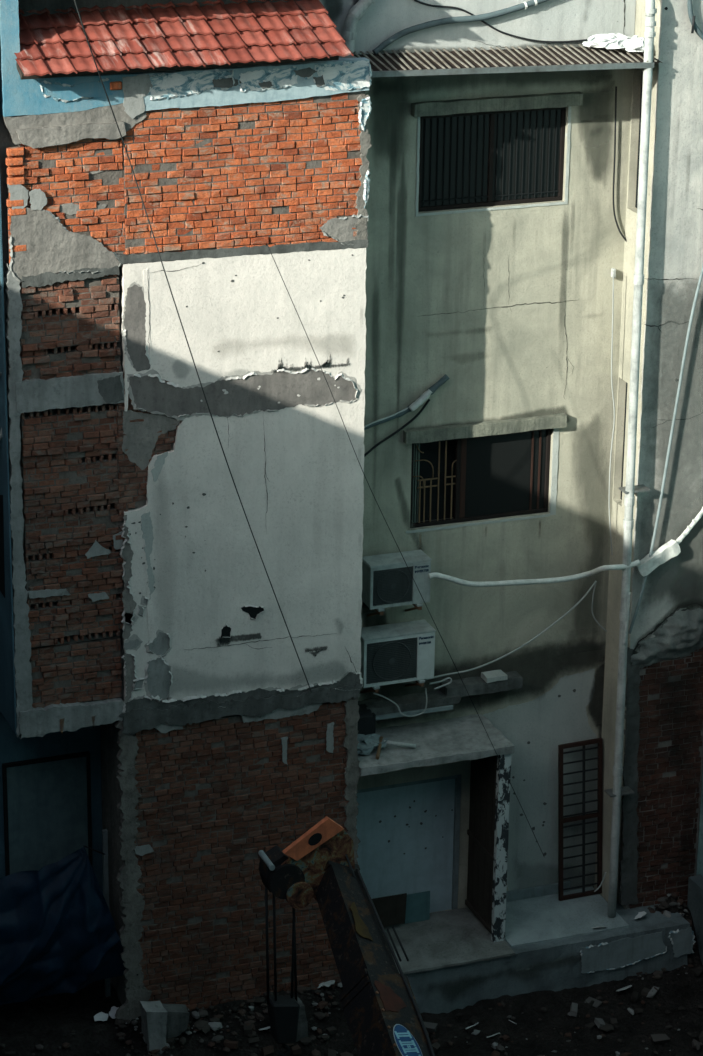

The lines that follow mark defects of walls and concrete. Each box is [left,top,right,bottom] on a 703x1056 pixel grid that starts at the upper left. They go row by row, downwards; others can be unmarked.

peeling [40,60,372,131]
spalling [7,184,122,288]
spalling [319,170,371,256]
crack [423,256,576,394]
spalling [97,282,362,482]
spalling [28,589,70,599]
spalling [326,722,334,753]
peeling [483,668,598,891]